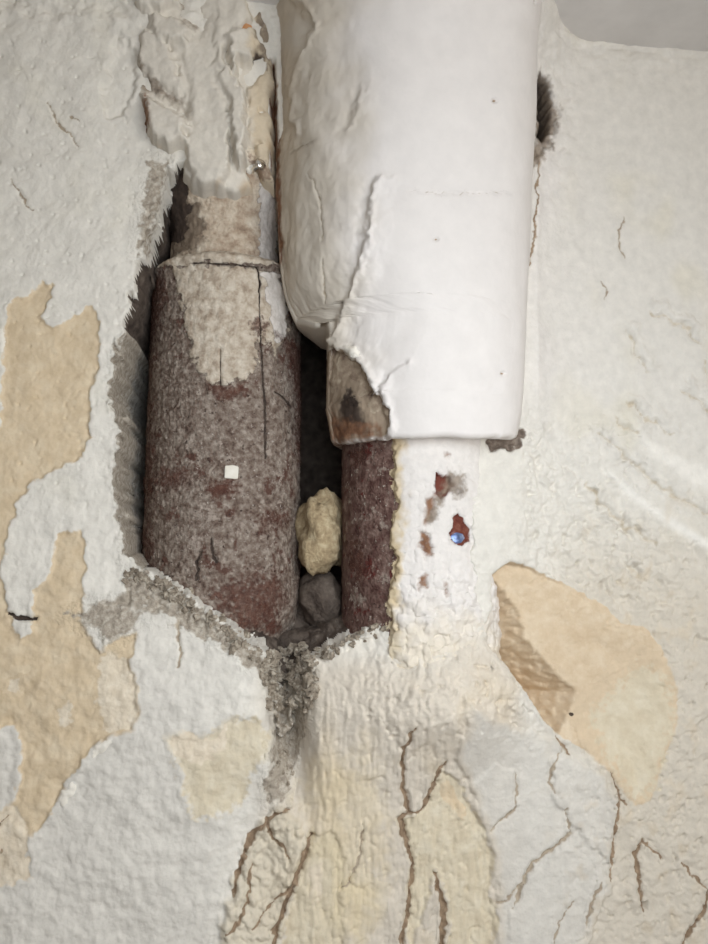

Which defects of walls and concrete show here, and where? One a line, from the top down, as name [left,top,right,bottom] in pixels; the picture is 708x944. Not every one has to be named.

spalling [125,150,179,268]
corrosion [142,271,188,566]
corrosion [209,384,243,401]
peeling [326,341,399,450]
peeling [0,272,321,894]
corrosion [210,568,288,636]
corrosion [410,445,474,602]
spalling [482,557,695,824]
crack [223,806,316,944]
crack [394,725,452,944]
crack [488,727,575,915]
crack [551,769,708,944]